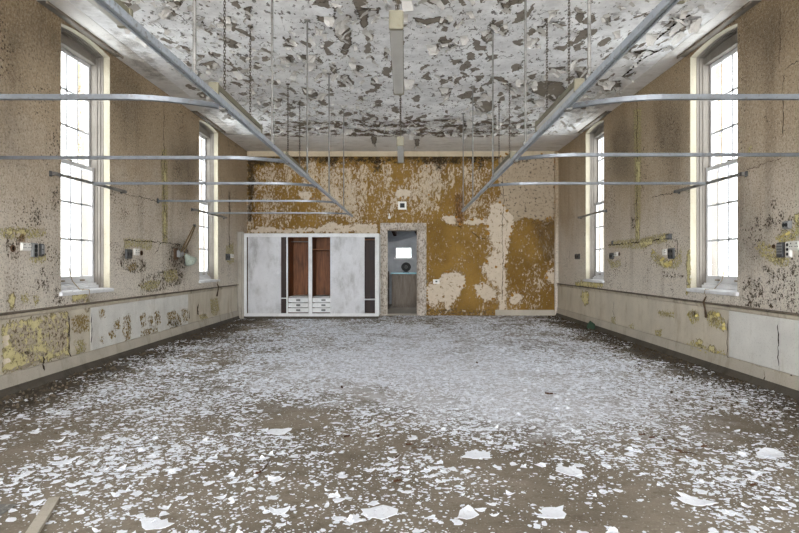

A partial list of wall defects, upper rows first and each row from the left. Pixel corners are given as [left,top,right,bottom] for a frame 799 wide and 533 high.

peeling [121,0,587,149]
peeling [547,0,717,137]
peeling [1,254,90,375]
peeling [99,309,188,344]
spalling [120,150,185,293]
peeling [249,164,379,233]
peeling [382,153,555,315]
peeling [687,309,727,332]
spalling [740,200,799,311]